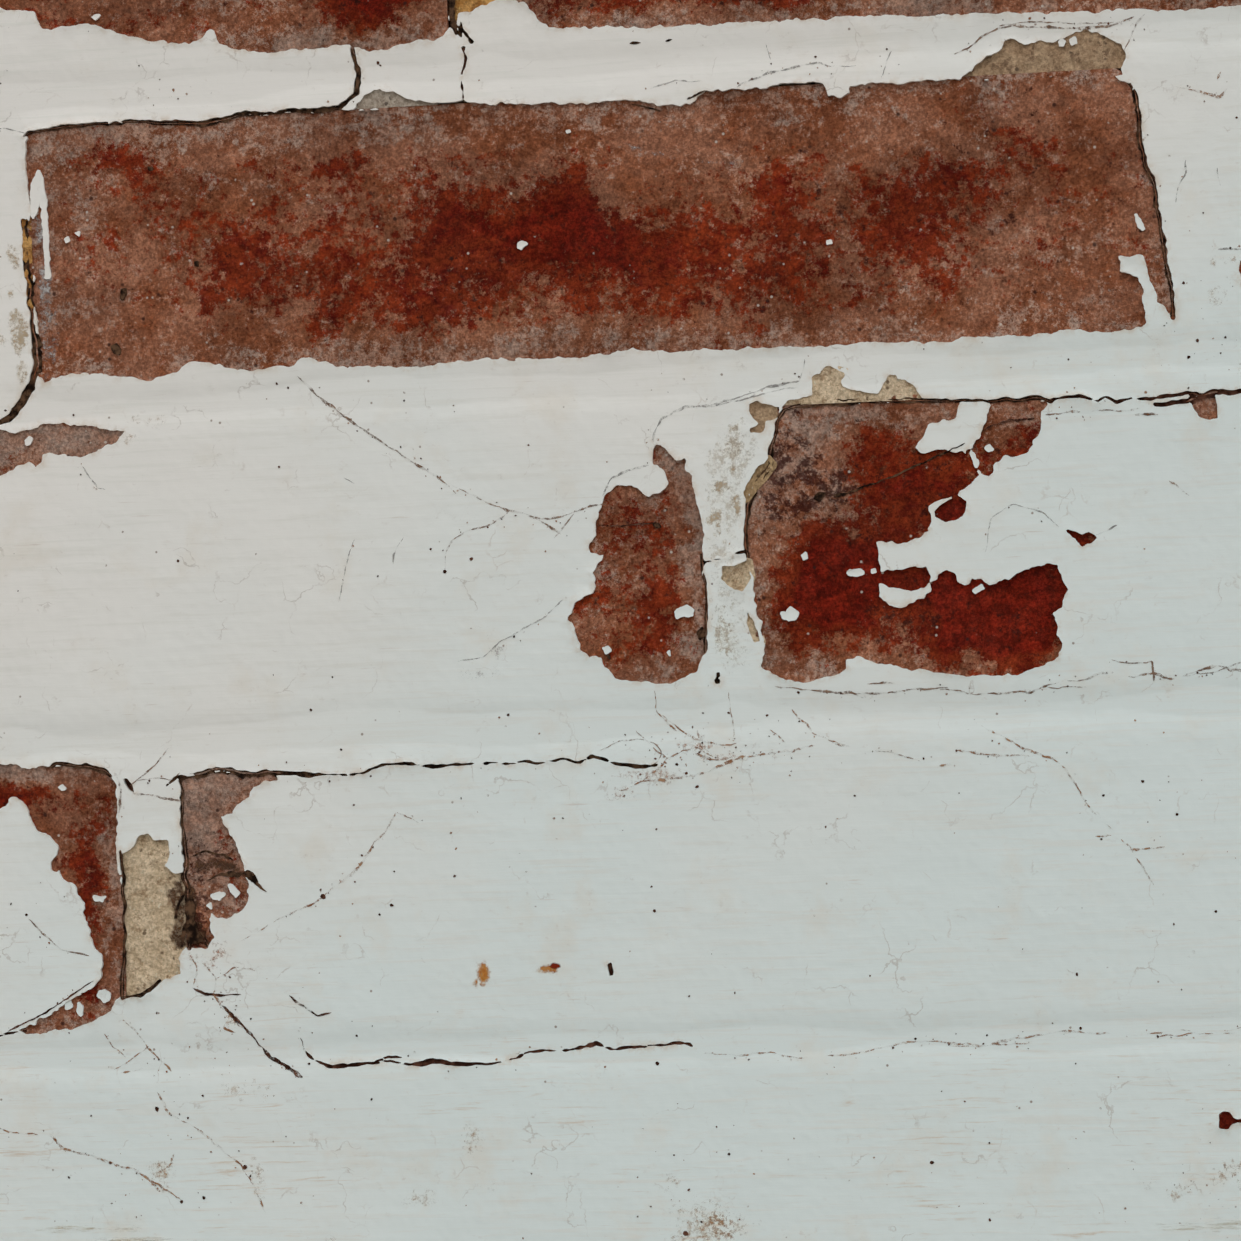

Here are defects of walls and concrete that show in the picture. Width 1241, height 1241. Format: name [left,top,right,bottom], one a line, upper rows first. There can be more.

peeling [0,0,494,53]
peeling [517,0,1241,29]
peeling [21,30,1176,382]
peeling [0,423,124,476]
crack [298,360,1241,653]
peeling [568,366,1068,684]
peeling [0,762,281,1034]
crack [50,660,1241,1078]